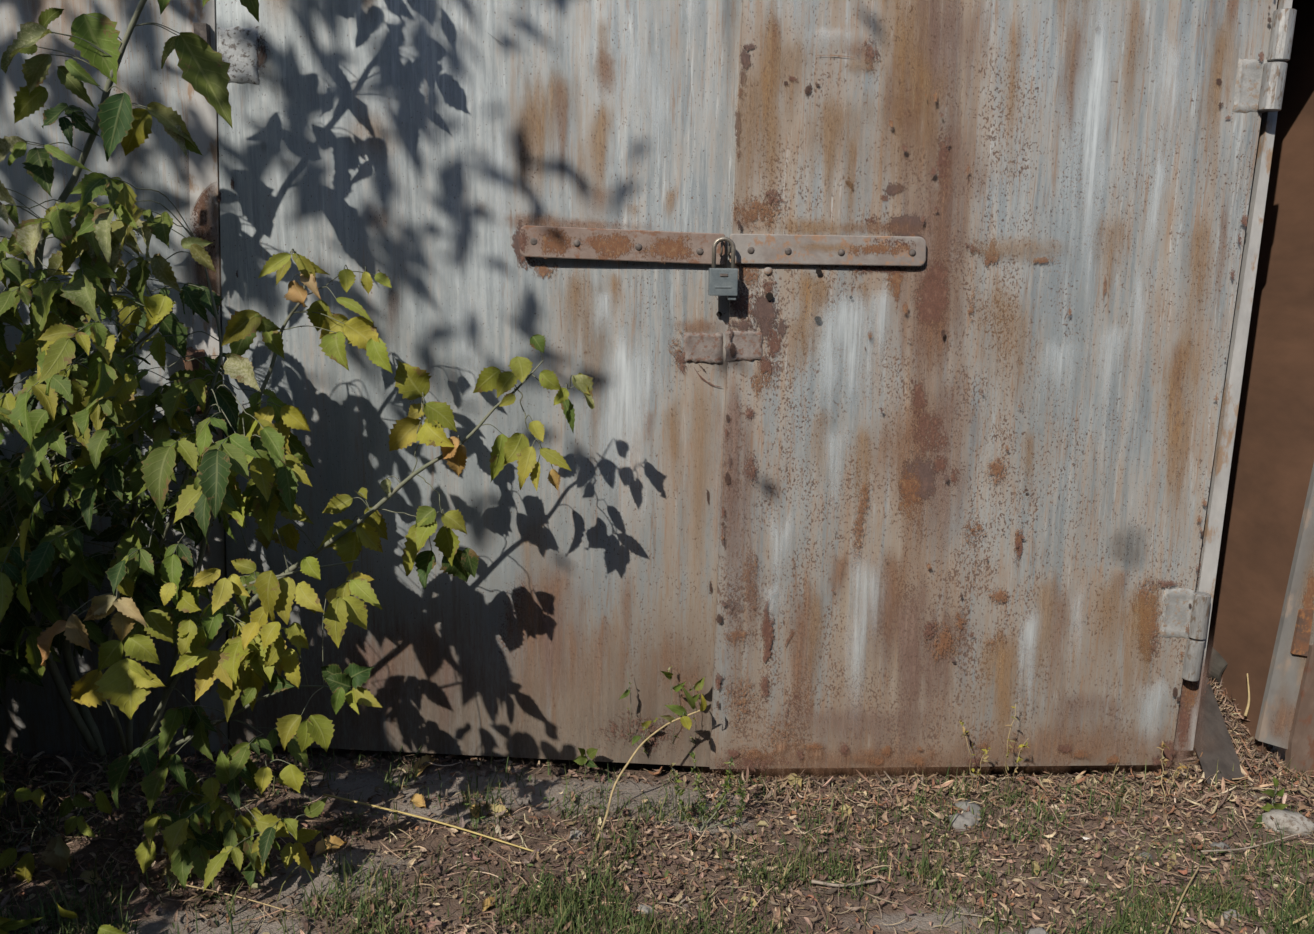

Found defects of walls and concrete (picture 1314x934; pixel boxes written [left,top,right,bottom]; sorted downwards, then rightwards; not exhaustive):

corrosion [511,110,694,302]
corrosion [731,264,779,339]
corrosion [732,189,785,227]
corrosion [792,213,950,333]
corrosion [880,175,907,201]
corrosion [965,237,1056,268]
corrosion [718,393,759,648]
corrosion [833,434,870,582]
corrosion [1014,525,1023,565]
corrosion [1101,575,1178,669]
corrosion [599,711,683,756]
corrosion [1159,658,1206,771]